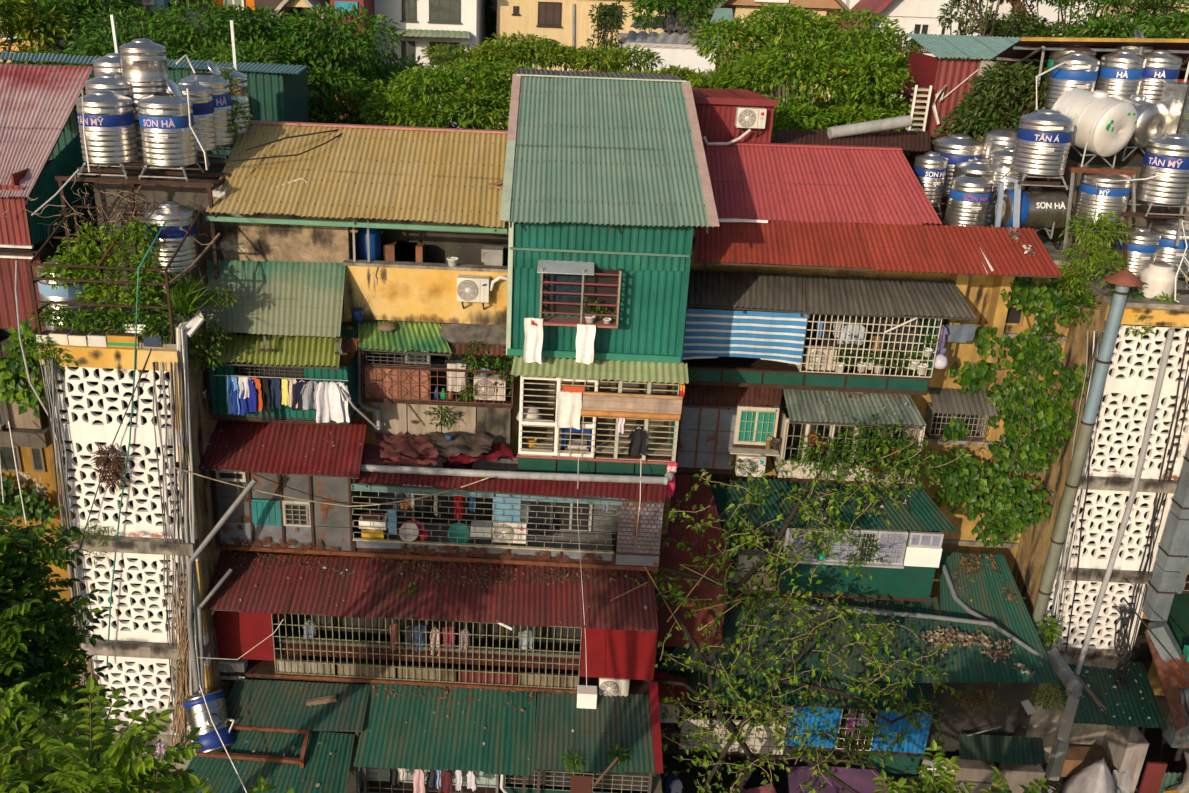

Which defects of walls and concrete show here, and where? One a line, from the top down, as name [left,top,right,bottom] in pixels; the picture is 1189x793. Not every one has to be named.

leakage [218,224,239,238]
leakage [253,224,290,254]
leakage [476,310,507,325]
rust [222,497,339,552]